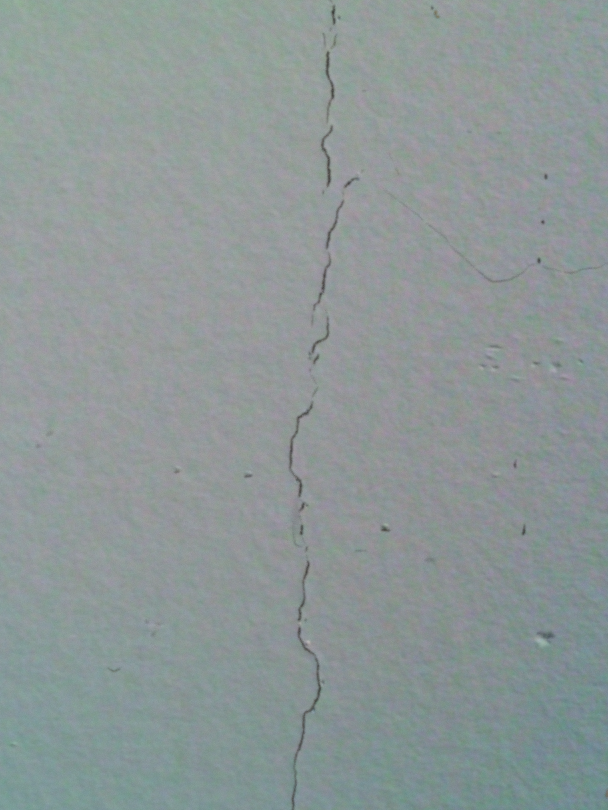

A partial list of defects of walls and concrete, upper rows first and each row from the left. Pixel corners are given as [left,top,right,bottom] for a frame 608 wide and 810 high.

crack [289,0,363,810]
crack [383,188,608,282]